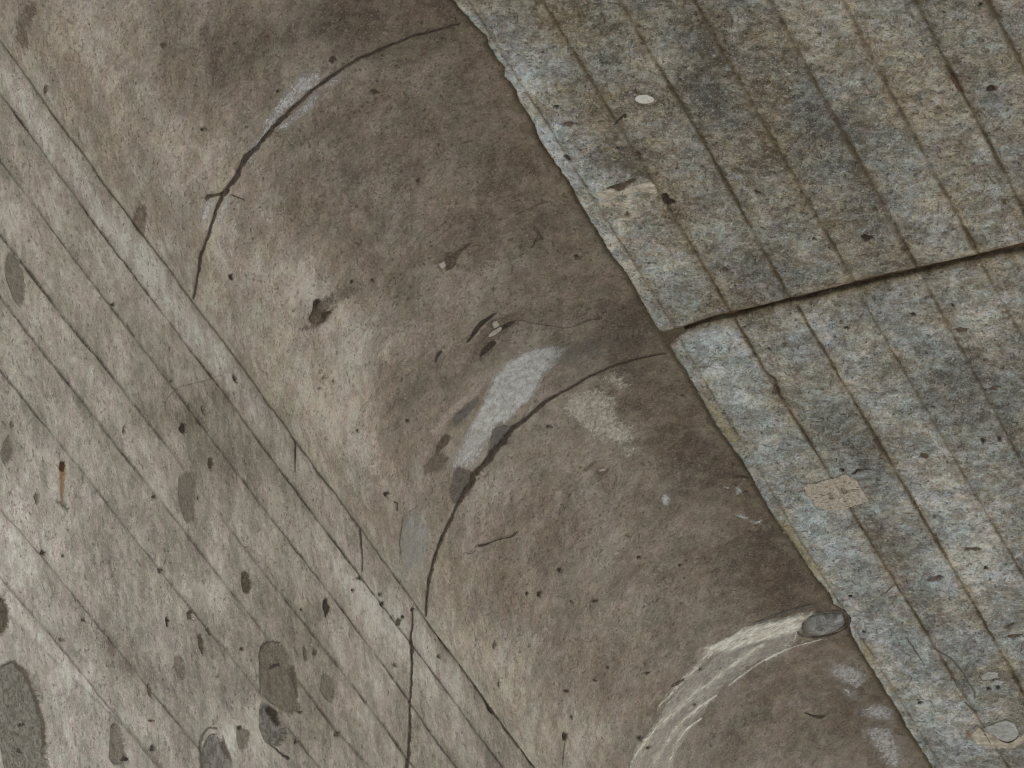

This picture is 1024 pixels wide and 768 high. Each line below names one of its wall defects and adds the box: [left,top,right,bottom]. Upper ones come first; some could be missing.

crack [193,23,461,299]
rust [57,462,69,510]
leakage [425,347,564,503]
crack [405,353,666,768]
leakage [634,604,821,768]